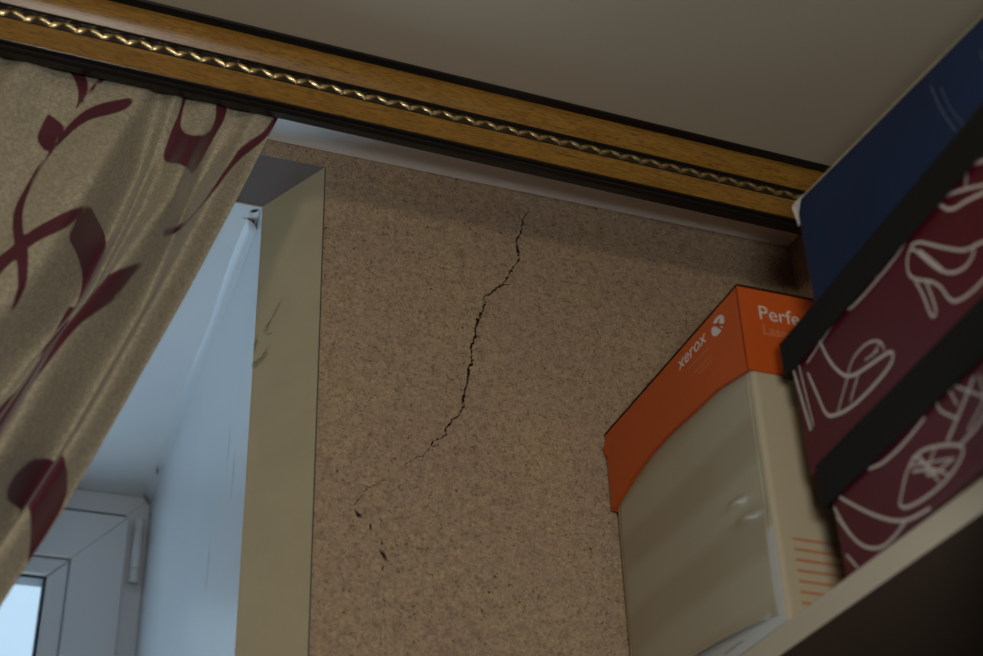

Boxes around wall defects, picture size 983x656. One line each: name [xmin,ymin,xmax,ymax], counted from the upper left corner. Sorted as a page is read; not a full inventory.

crack [405,212,529,464]